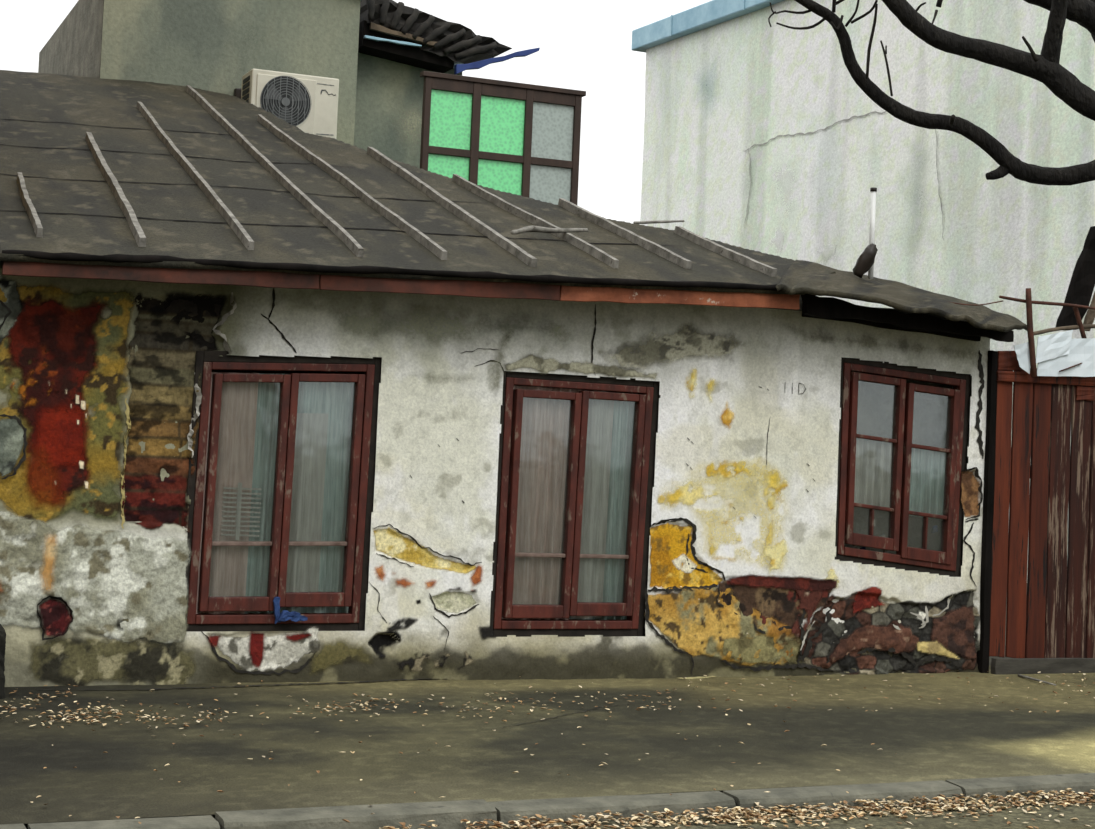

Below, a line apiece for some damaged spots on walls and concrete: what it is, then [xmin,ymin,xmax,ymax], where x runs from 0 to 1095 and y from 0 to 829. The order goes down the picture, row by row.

crack [744,111,886,228]
crack [261,288,297,353]
peeling [0,275,237,643]
peeling [374,524,482,618]
peeling [650,517,832,634]